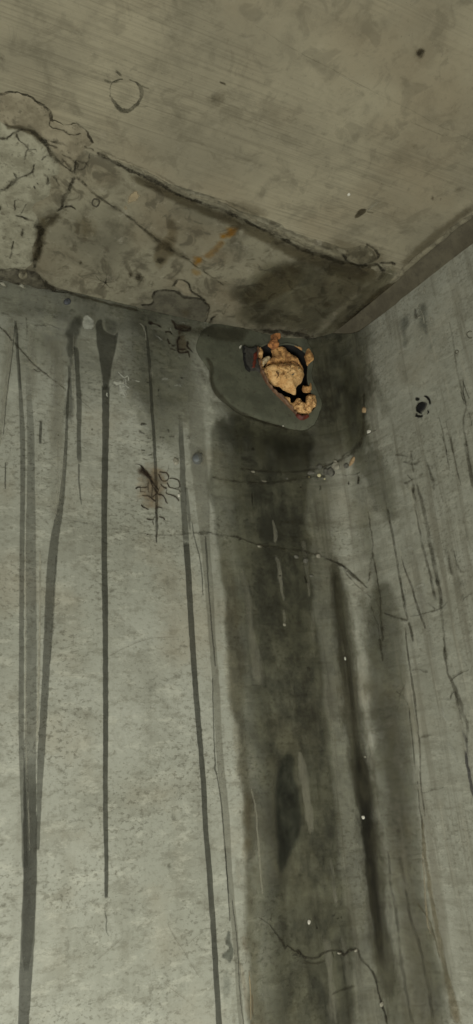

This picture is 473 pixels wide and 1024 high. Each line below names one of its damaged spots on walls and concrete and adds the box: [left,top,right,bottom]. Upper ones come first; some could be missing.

crack [0,91,396,323]
leakage [83,315,94,329]
leakage [190,429,251,1024]
leakage [361,799,384,922]
crack [262,919,387,1023]